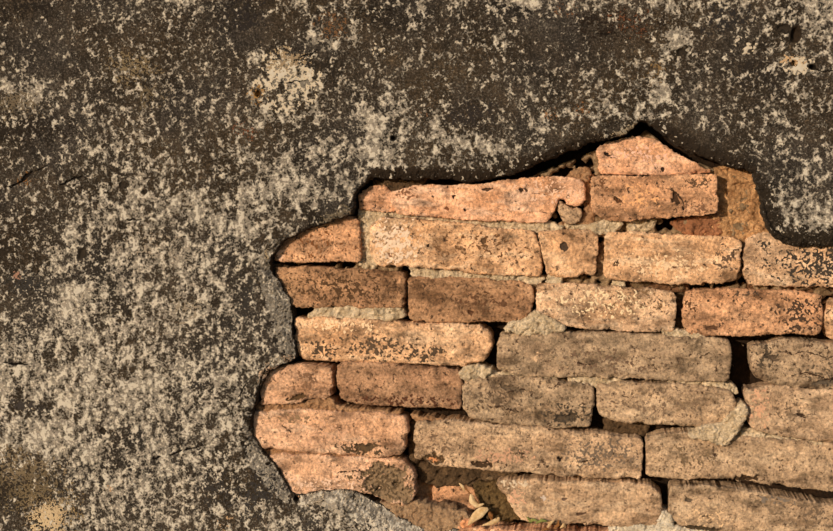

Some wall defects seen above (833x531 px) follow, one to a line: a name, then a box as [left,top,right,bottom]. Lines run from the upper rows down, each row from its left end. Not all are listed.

crack [5,165,48,188]
spalling [319,204,353,224]
spalling [367,122,638,191]
spalling [651,118,833,247]
spalling [257,248,295,385]
peeling [245,445,414,529]
peeling [422,452,445,465]
peeling [471,460,493,468]